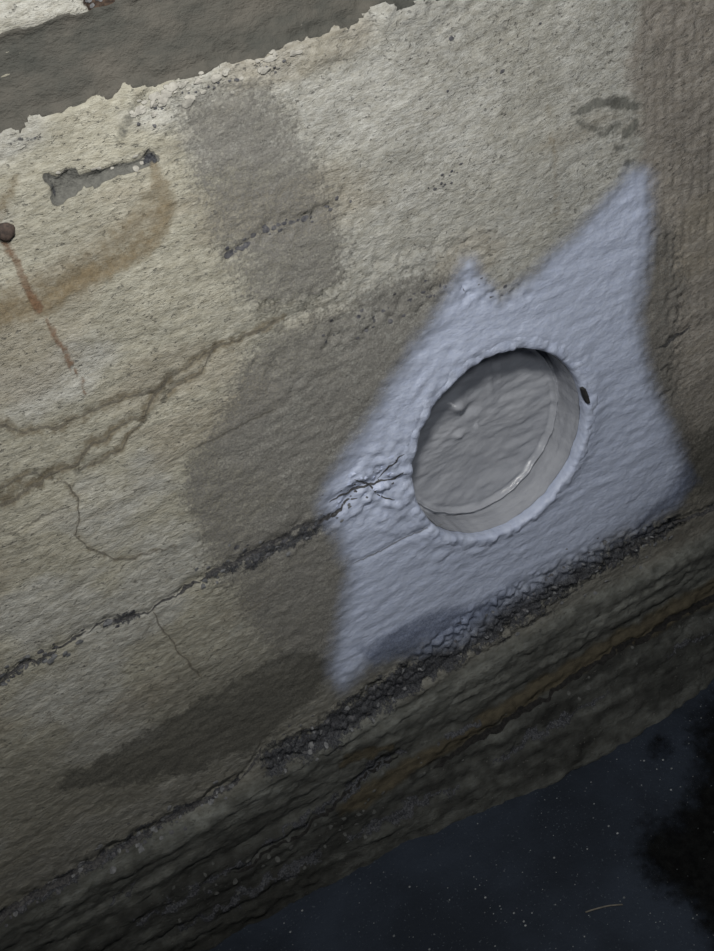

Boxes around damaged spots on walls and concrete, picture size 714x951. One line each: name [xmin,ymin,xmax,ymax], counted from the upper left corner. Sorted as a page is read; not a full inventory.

peeling [129,68,244,128]
damp [171,78,347,313]
peeling [255,49,303,74]
crack [83,319,279,456]
crack [0,455,404,686]
damp [179,273,459,678]